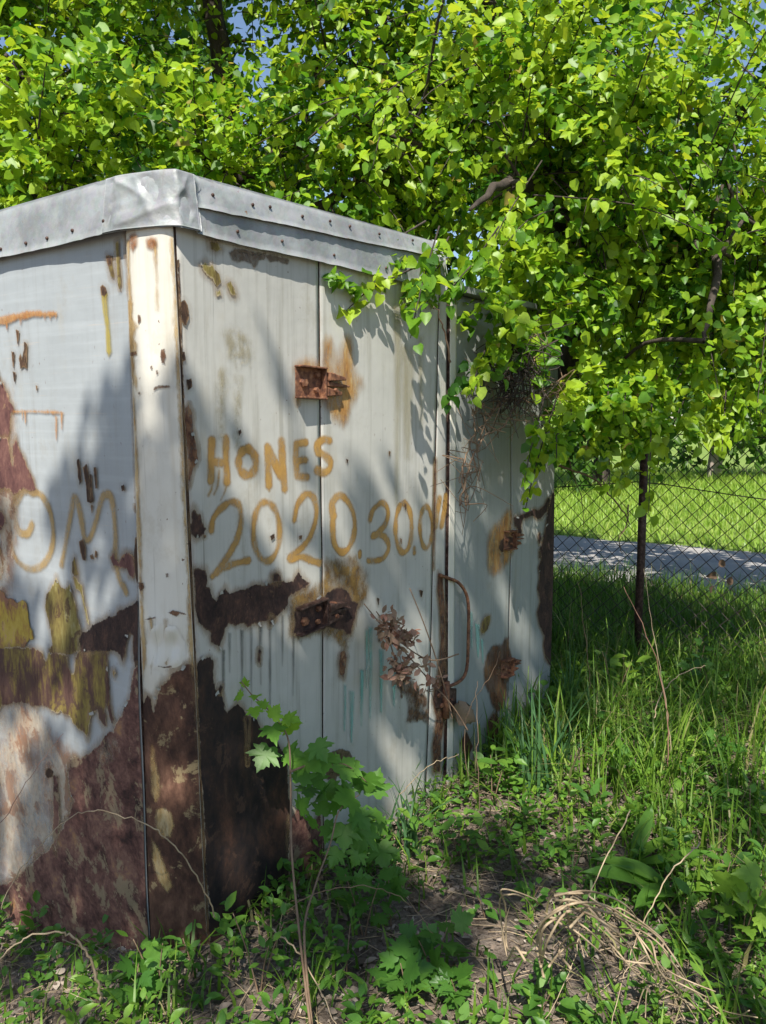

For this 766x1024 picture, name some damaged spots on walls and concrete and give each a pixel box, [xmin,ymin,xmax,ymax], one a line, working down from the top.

peeling [0,329,35,495]
corrosion [302,337,358,423]
corrosion [0,234,324,951]
peeling [193,568,310,650]
corrosion [290,557,379,678]
corrosion [488,511,513,573]
corrosion [460,732,473,761]
corrosion [484,637,512,750]